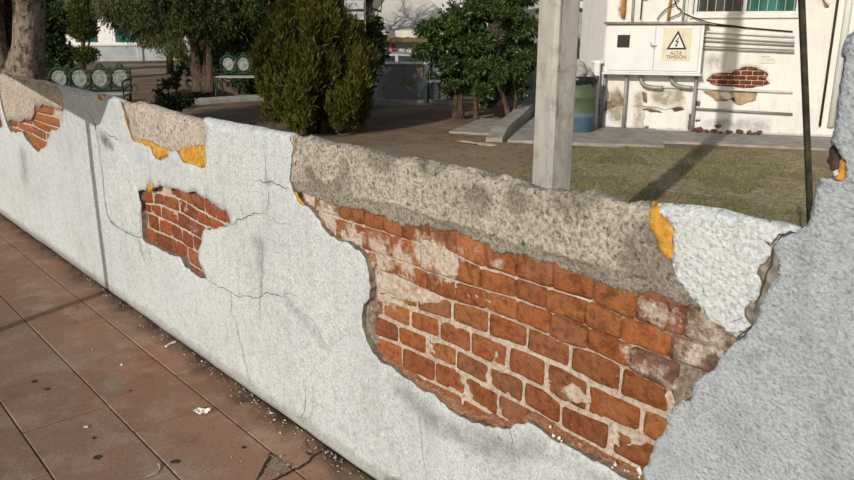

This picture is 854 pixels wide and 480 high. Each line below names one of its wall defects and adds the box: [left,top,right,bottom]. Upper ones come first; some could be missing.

flaking render [0,73,64,149]
flaking render [123,101,211,168]
flaking render [672,67,770,130]
flaking render [142,182,230,277]
crack [232,161,293,226]
crack [206,273,335,380]
flaking render [291,135,778,480]